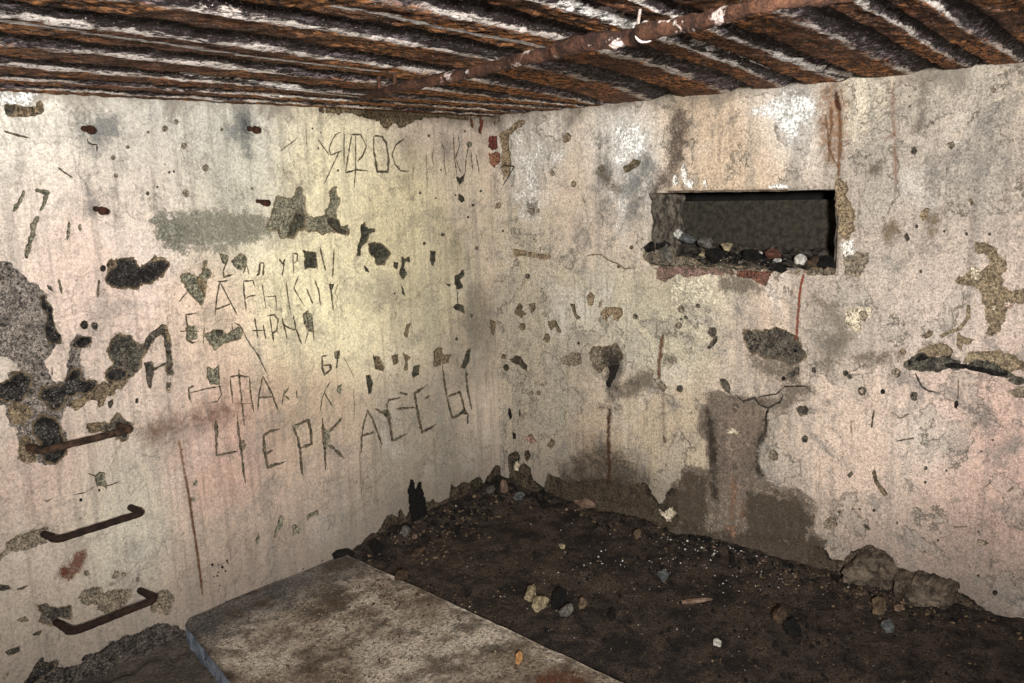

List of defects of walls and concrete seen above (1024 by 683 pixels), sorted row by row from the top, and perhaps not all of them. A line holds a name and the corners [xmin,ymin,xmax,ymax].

spalling [455,174,474,218]
peeling [100,183,410,306]
peeling [883,207,945,245]
peeling [899,232,1024,373]
spalling [0,261,150,466]
peeling [560,341,623,375]
peeling [616,370,654,398]
spalling [742,326,816,418]
crack [735,385,809,437]
leakage [426,390,940,577]
leakage [377,507,410,534]
leakage [953,580,985,610]